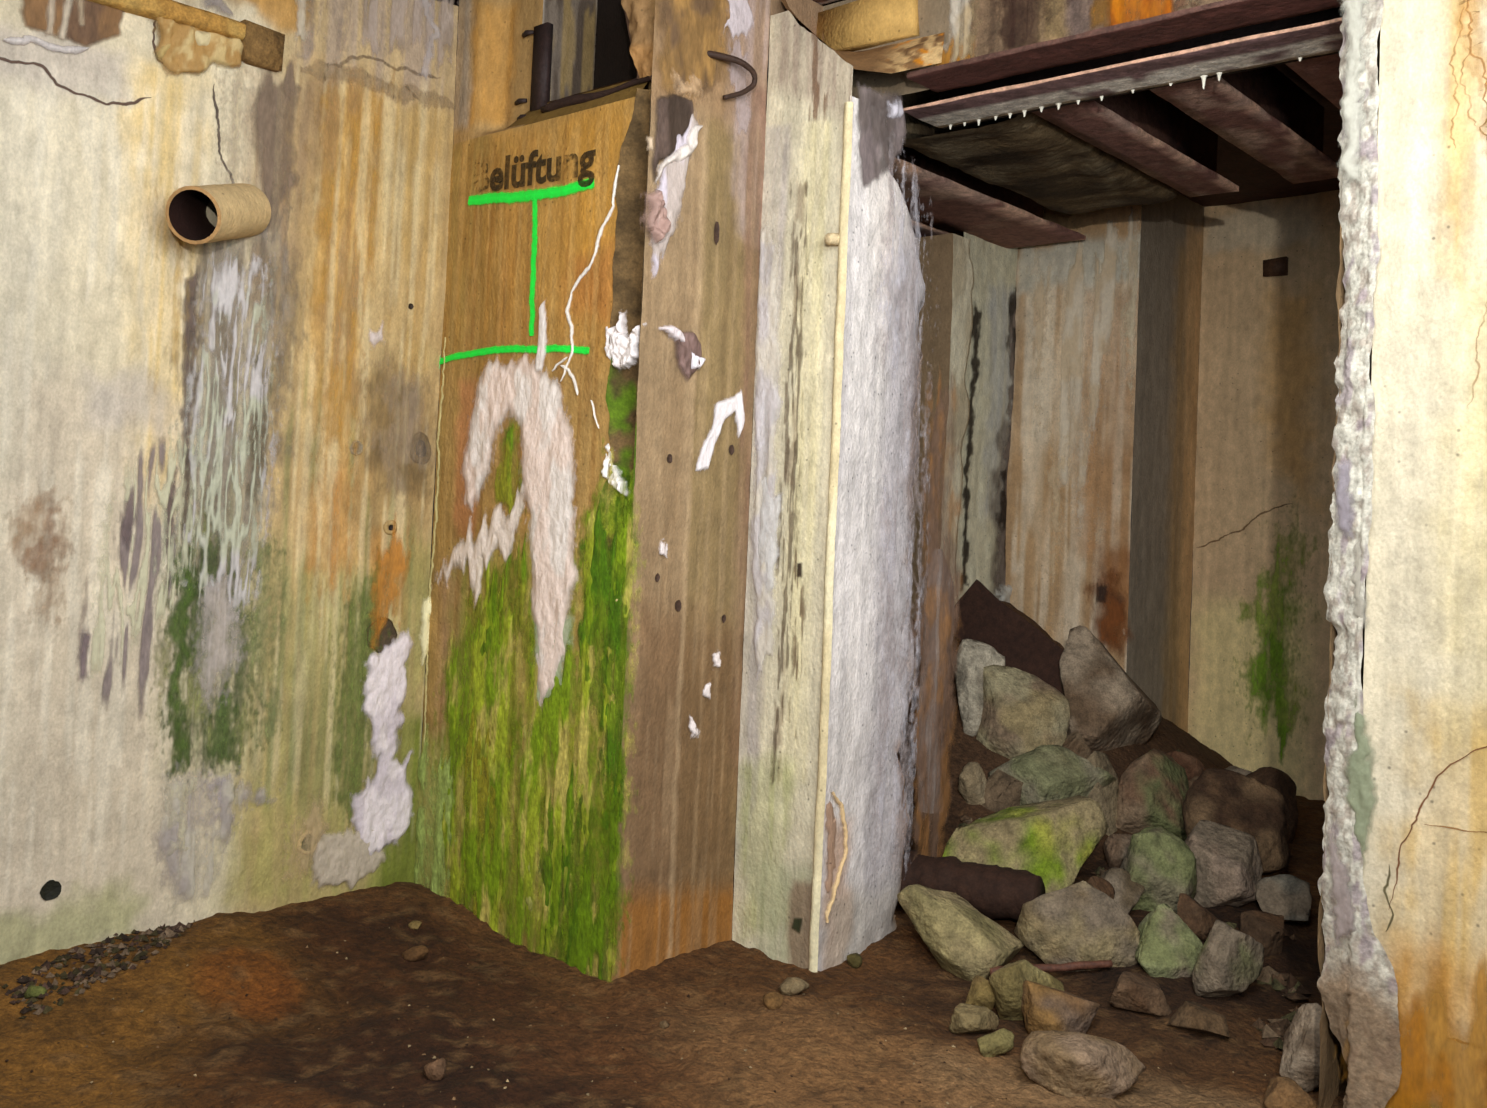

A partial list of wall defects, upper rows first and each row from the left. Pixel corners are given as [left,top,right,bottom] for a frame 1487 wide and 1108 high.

flaking render [23,0,124,47]
crack [0,35,151,106]
flaking render [156,17,243,74]
crack [213,84,235,184]
rust [1091,0,1197,27]
damp [163,0,313,697]
rust [319,82,382,435]
spalling [596,0,730,553]
damp [438,302,577,705]
damp [313,597,431,889]
crack [1383,746,1487,931]
rust [1386,964,1487,1108]